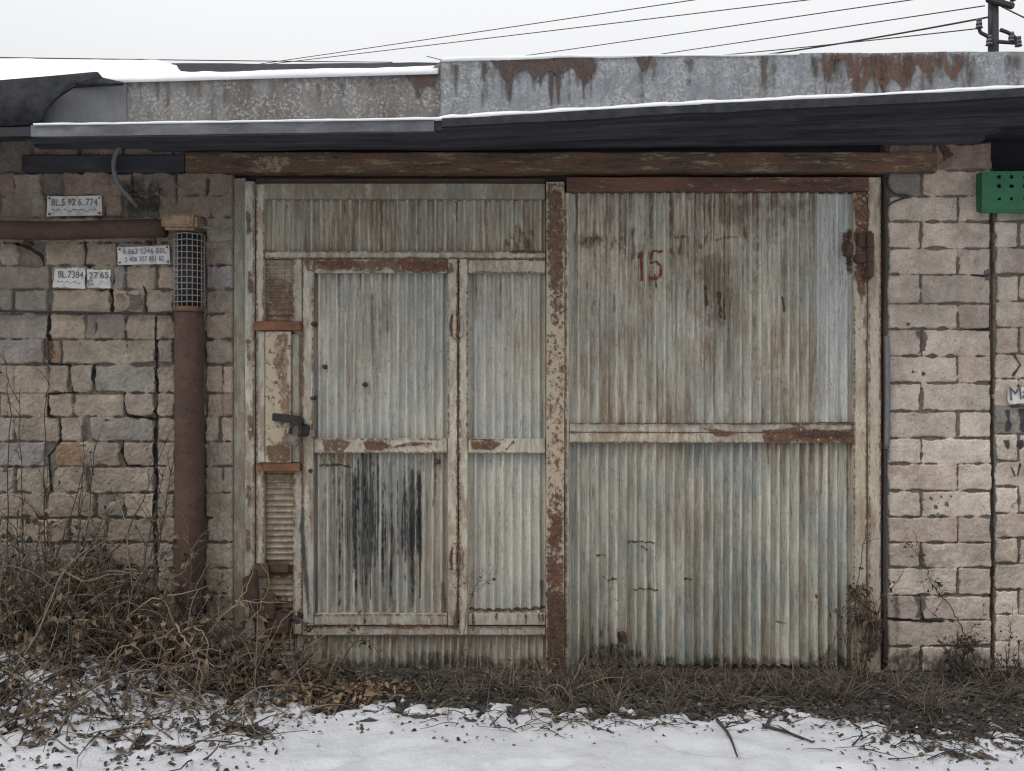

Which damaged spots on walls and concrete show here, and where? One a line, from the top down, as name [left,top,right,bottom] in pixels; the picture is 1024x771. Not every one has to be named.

rust [491,57,596,105]
rust [822,52,969,94]
peeling [266,334,290,427]
peeling [266,442,290,463]
rust [252,184,882,672]
water stain [325,453,421,612]